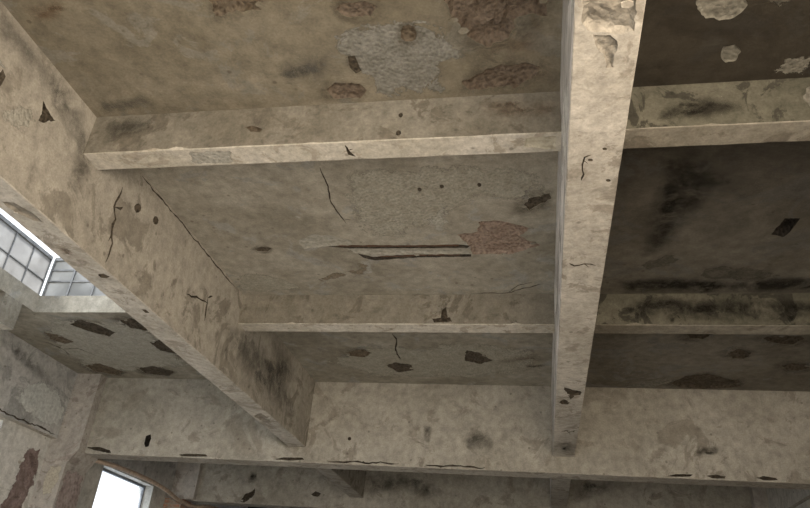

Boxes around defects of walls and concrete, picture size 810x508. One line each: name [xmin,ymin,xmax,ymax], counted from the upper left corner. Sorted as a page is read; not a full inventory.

spalling [326,83,366,101]
peeling [334,0,549,98]
spalling [568,0,637,68]
peeling [696,0,748,20]
peeling [774,56,810,75]
crack [106,187,123,261]
crack [142,176,235,287]
crack [320,168,349,223]
spalling [299,220,540,281]
crack [187,294,212,318]
peeling [0,447,40,508]
peeling [55,471,83,508]